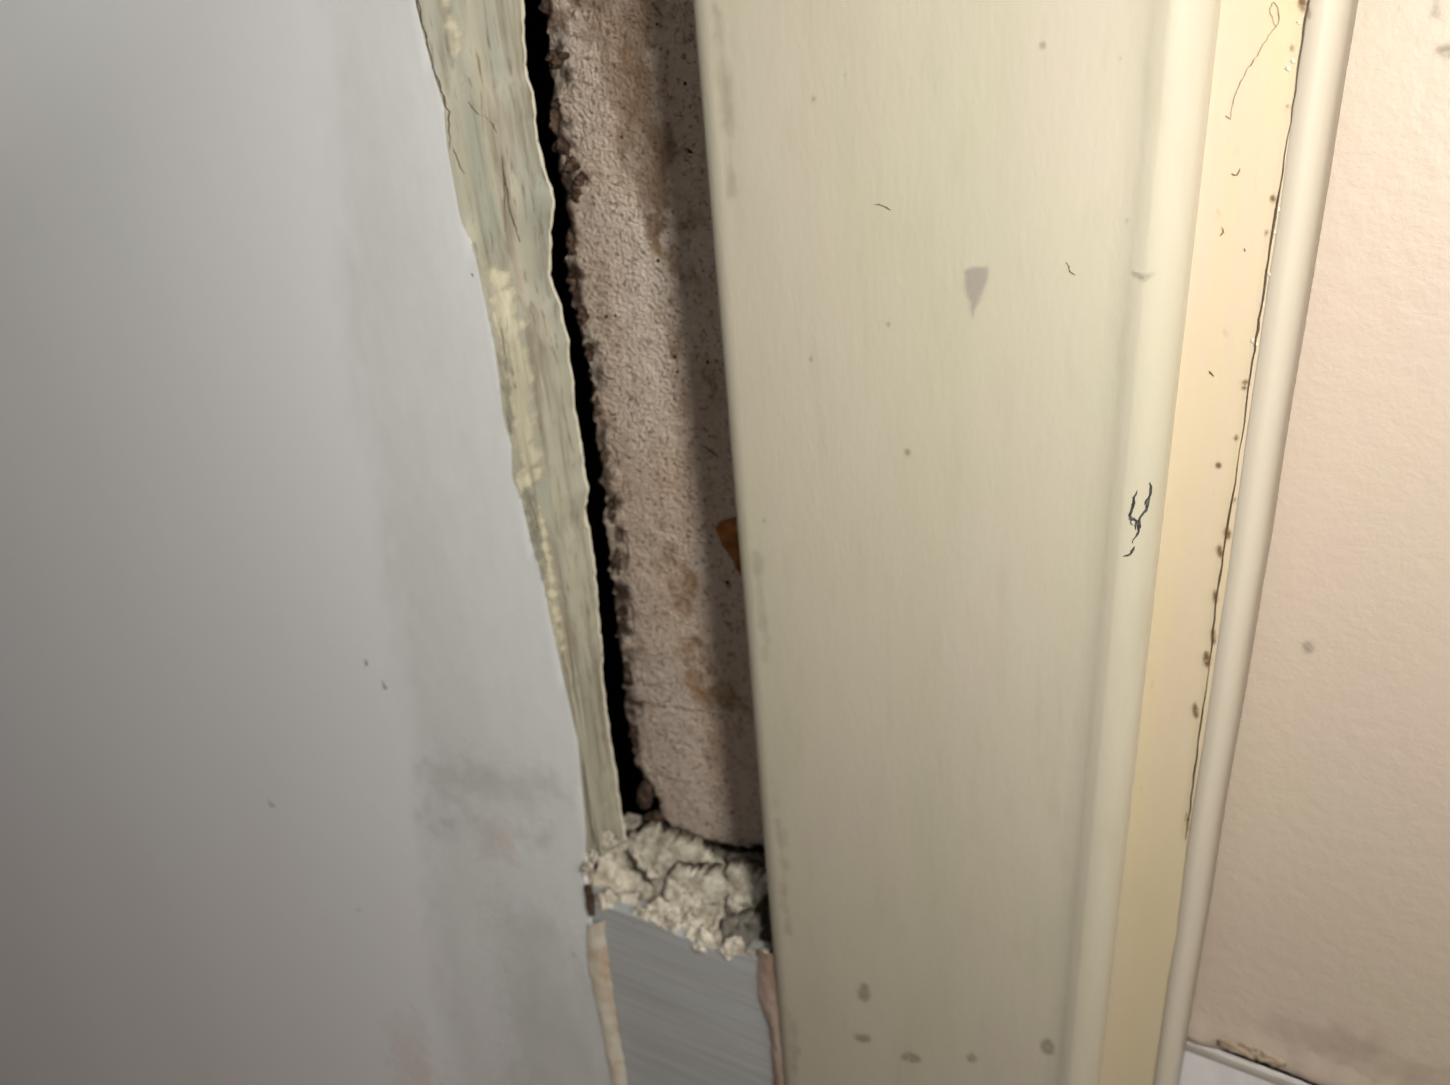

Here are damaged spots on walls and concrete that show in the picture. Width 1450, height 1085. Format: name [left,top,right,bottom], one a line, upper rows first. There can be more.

peeling [415,0,774,961]
spalling [1217,1039,1286,1068]